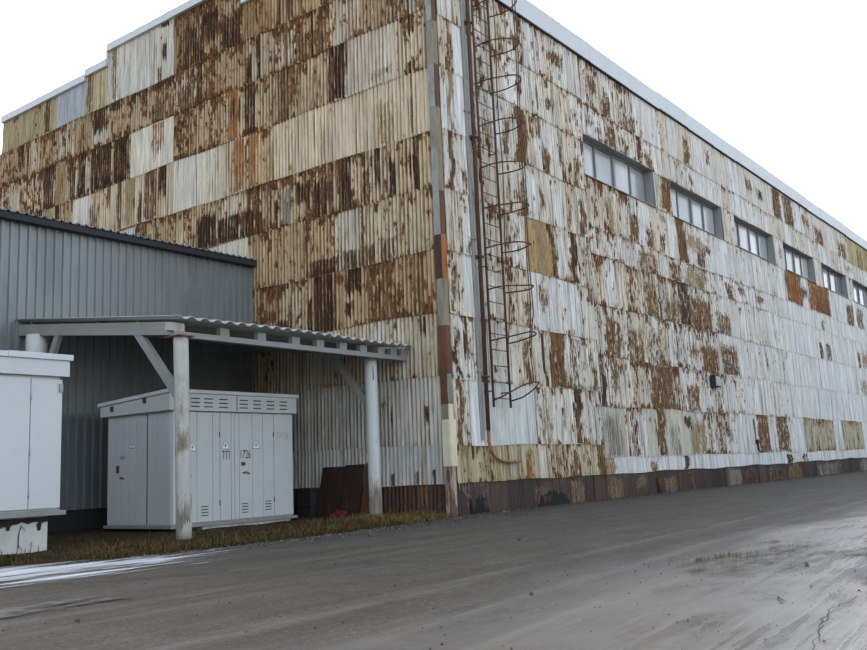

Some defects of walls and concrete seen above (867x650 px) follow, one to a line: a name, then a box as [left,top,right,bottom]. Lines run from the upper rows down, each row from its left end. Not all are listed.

corrosion [18,0,240,230]
corrosion [196,34,278,249]
corrosion [277,0,348,124]
corrosion [296,60,426,338]
corrosion [446,30,468,194]
corrosion [451,266,477,445]
corrosion [502,86,580,327]
corrosion [522,331,624,502]
corrosion [589,176,740,487]
corrosion [745,176,823,246]
corrosion [784,270,831,331]
water stain [0,517,48,531]